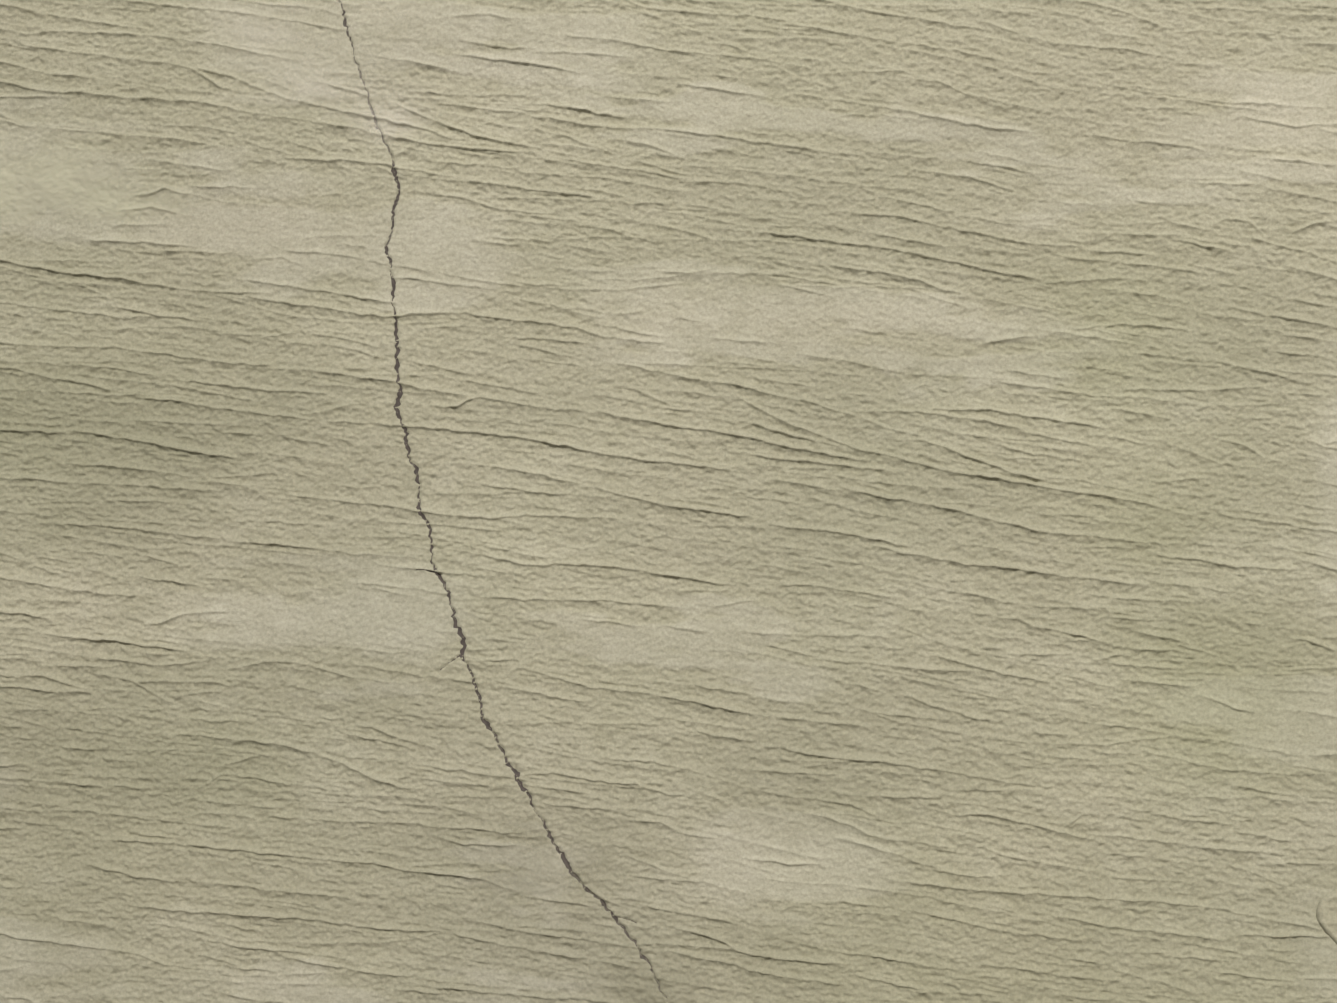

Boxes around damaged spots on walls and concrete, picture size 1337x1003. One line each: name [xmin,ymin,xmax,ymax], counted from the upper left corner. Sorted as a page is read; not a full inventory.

crack [338,0,667,998]